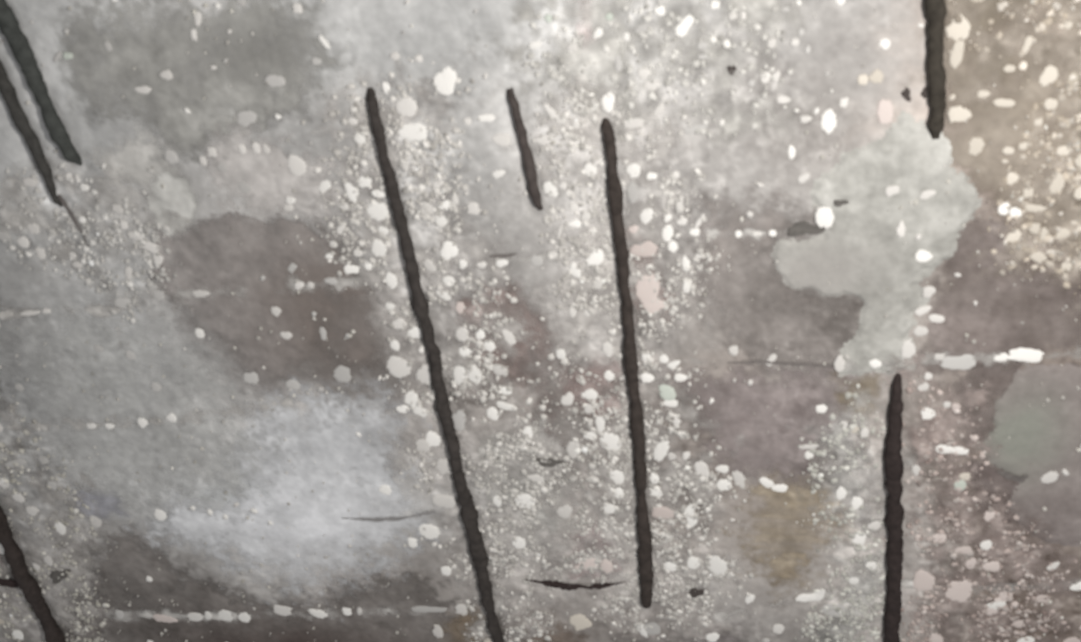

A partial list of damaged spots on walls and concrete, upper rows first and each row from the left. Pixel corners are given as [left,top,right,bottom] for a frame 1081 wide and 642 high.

crack [0,579,18,588]
crack [525,579,625,591]